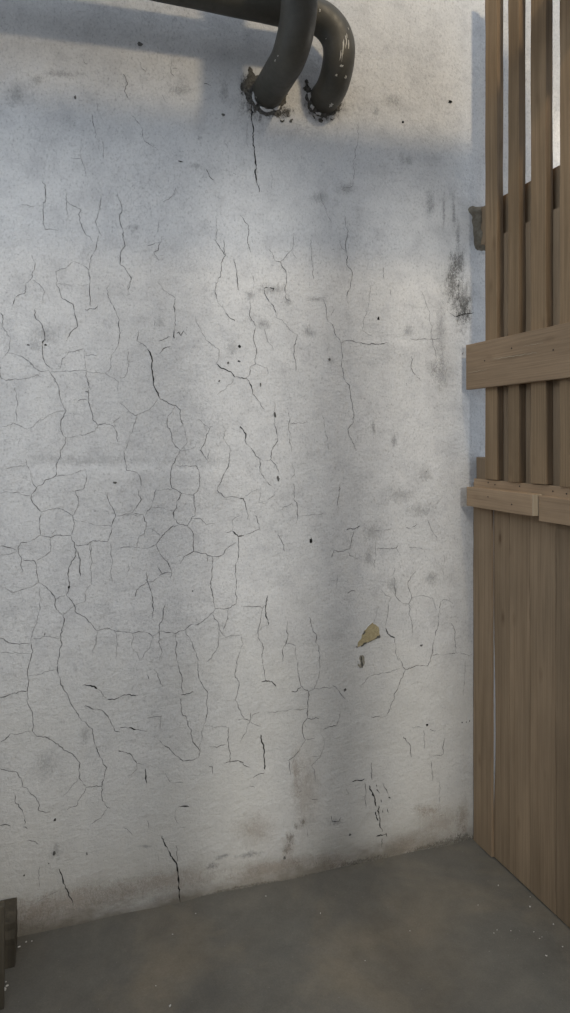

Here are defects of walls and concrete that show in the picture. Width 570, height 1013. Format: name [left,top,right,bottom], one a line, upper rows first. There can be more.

crack [206,104,273,192]
crack [0,182,472,902]
flaking render [356,622,380,668]